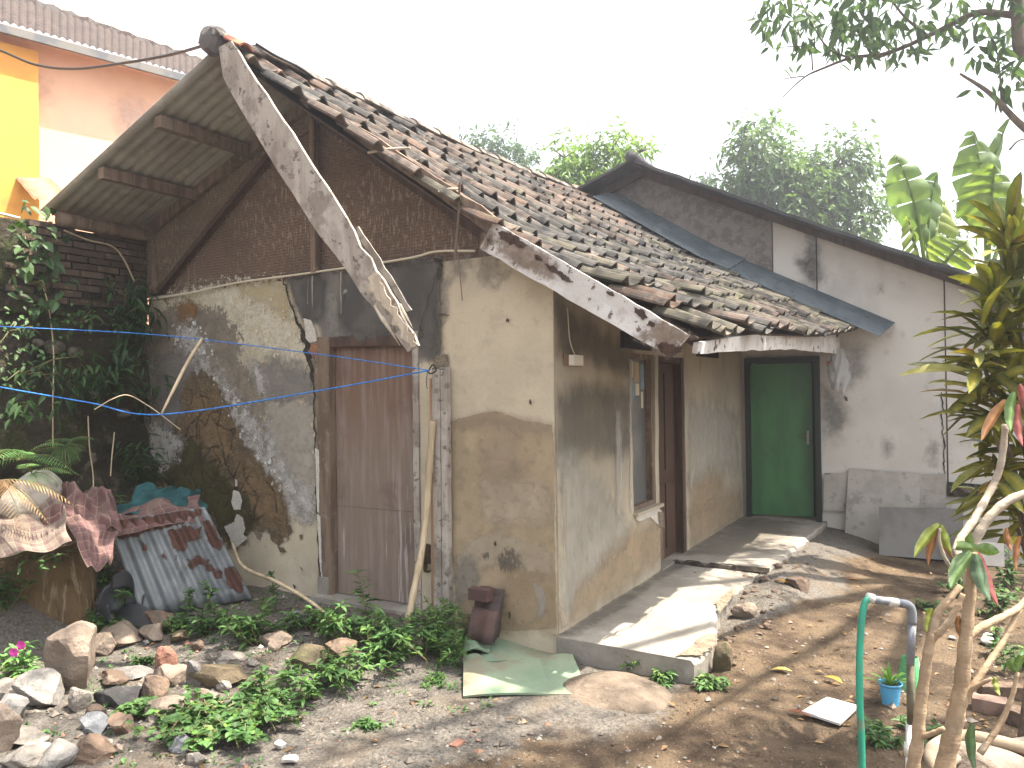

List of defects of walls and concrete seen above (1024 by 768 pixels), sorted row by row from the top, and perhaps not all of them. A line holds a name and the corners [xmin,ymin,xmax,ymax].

flaking render [144,271,318,552]
crack [283,278,321,577]
water stain [451,305,683,635]
water stain [825,391,845,429]